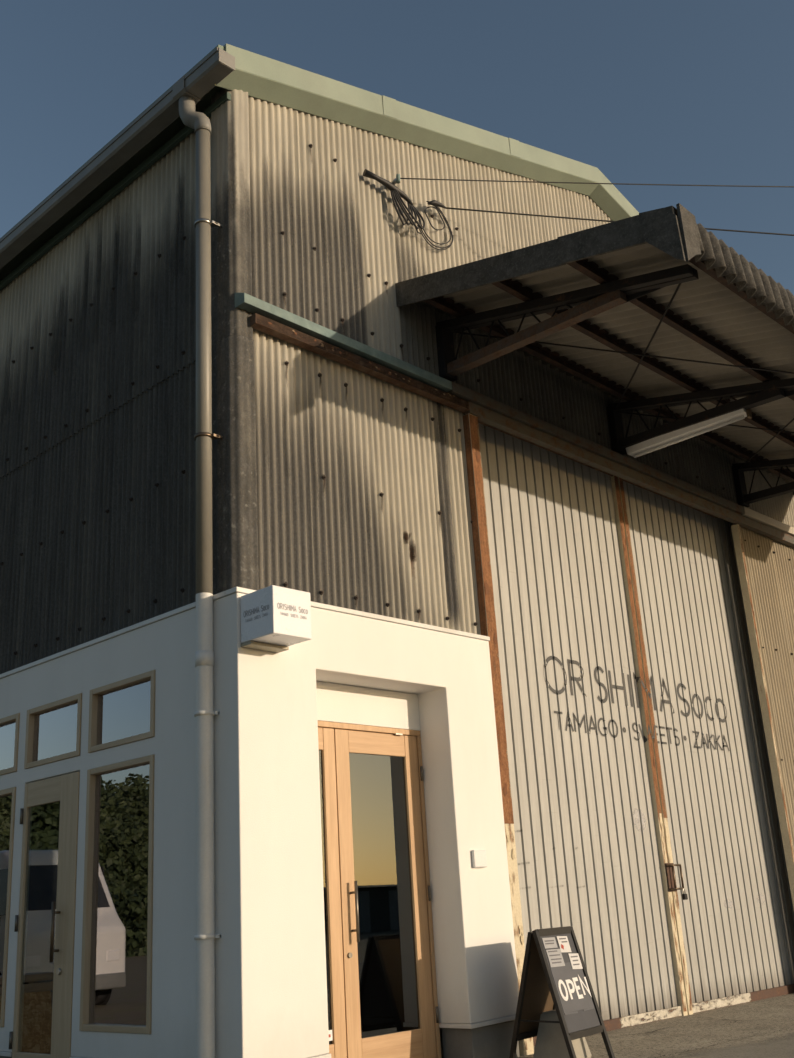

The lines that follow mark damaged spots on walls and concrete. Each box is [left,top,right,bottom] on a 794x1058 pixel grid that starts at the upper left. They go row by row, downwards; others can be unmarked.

damp [0,187,196,674]
damp [211,132,405,620]
damp [437,403,460,617]
peeling [620,892,751,1027]